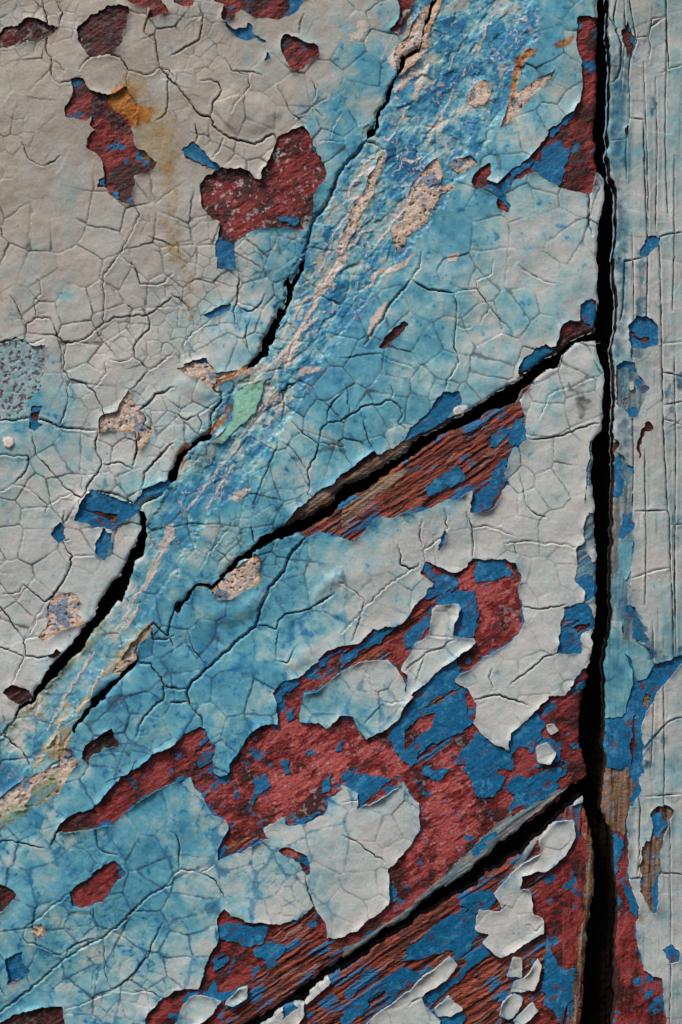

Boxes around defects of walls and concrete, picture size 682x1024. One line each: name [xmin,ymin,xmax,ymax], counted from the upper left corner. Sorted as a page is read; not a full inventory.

peeling [65,78,157,203]
corrosion [109,76,176,171]
peeling [182,126,327,269]
peeling [467,14,597,212]
crack [624,0,681,72]
crack [0,202,224,769]
crack [142,0,649,1024]
peeling [296,299,597,542]
crack [73,538,333,735]
peeling [600,316,682,1024]
peeling [56,558,595,1024]
crack [630,686,682,879]